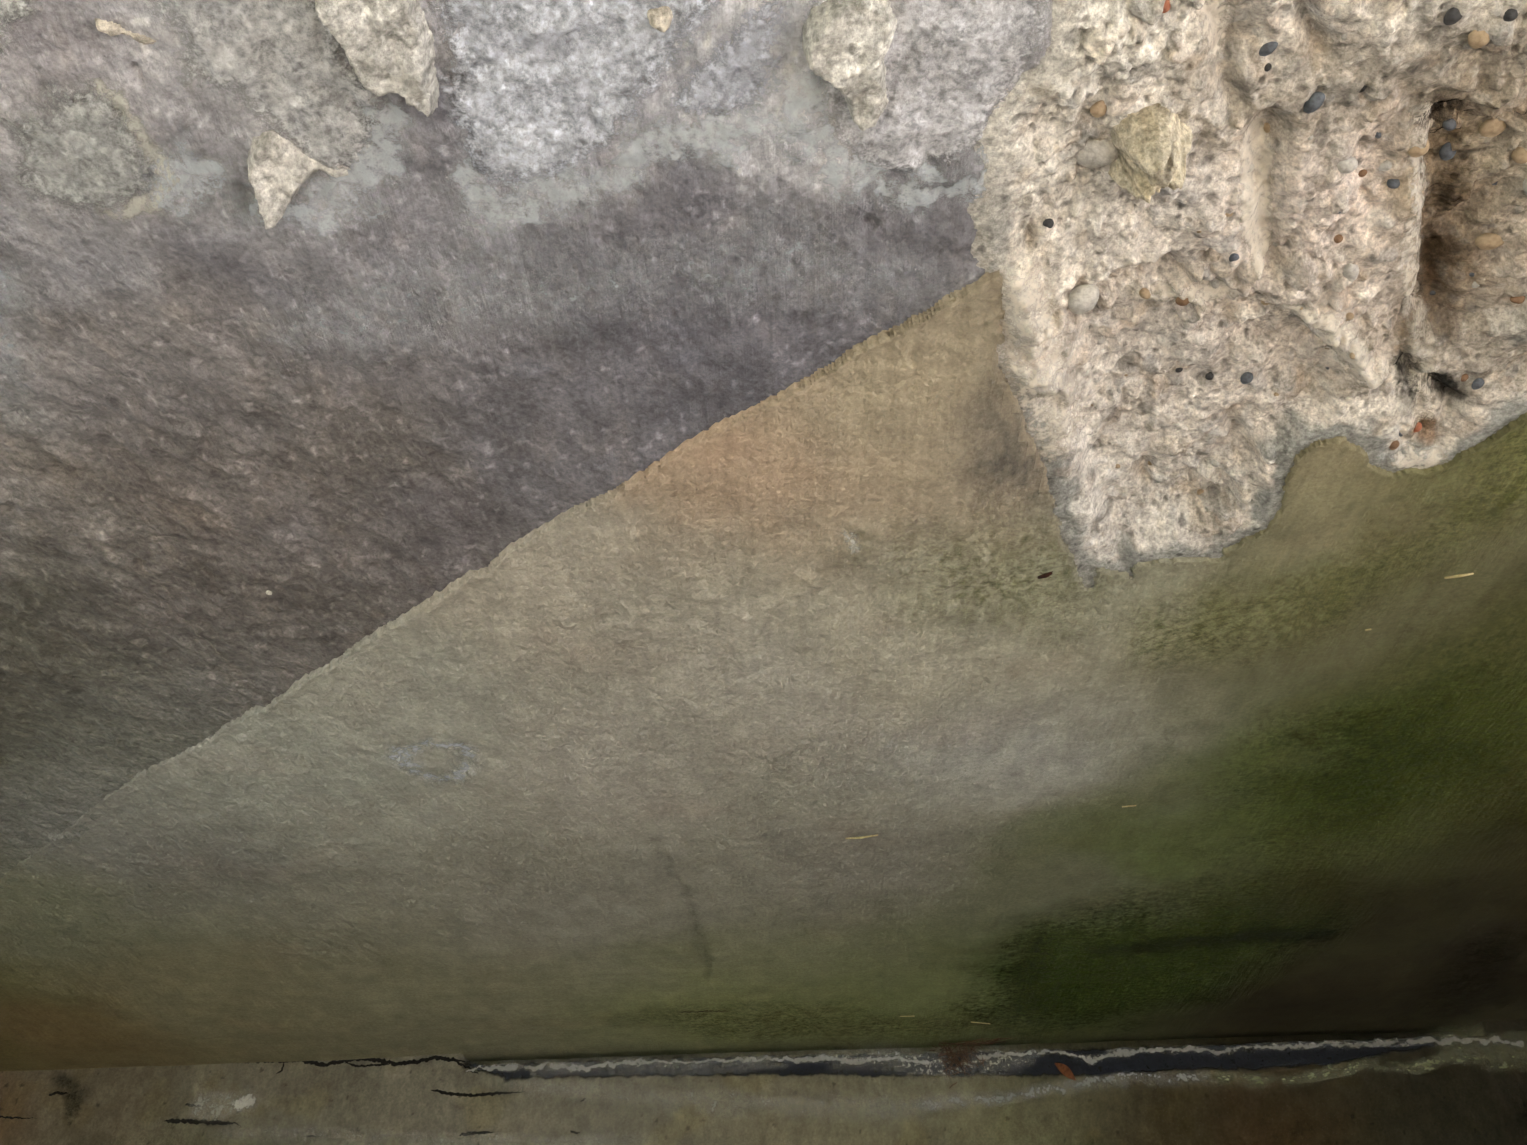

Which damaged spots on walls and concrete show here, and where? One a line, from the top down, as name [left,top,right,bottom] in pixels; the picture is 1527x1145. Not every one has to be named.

peeling [0,0,1527,889]
damp [1394,1037,1527,1073]
damp [913,1057,1371,1110]